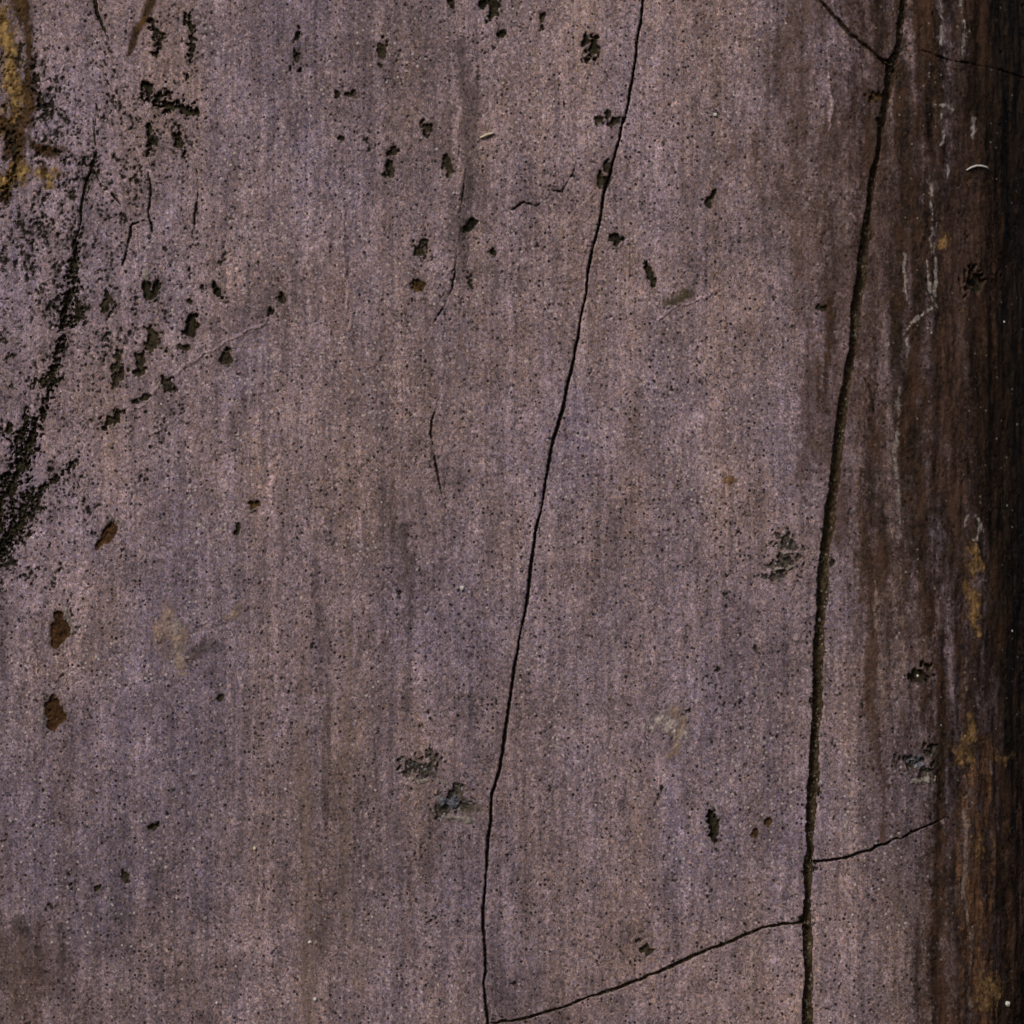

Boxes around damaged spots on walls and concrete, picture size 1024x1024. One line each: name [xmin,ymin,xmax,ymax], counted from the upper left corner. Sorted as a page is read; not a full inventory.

spalling [145,15,168,58]
spalling [183,11,198,81]
spalling [138,81,200,163]
spalling [382,144,400,184]
spalling [441,154,454,178]
spalling [412,228,433,256]
spalling [100,285,117,318]
spalling [141,269,162,301]
spalling [110,281,224,390]
spalling [99,374,179,431]
crack [481,0,934,1024]
leakage [845,0,1024,1024]